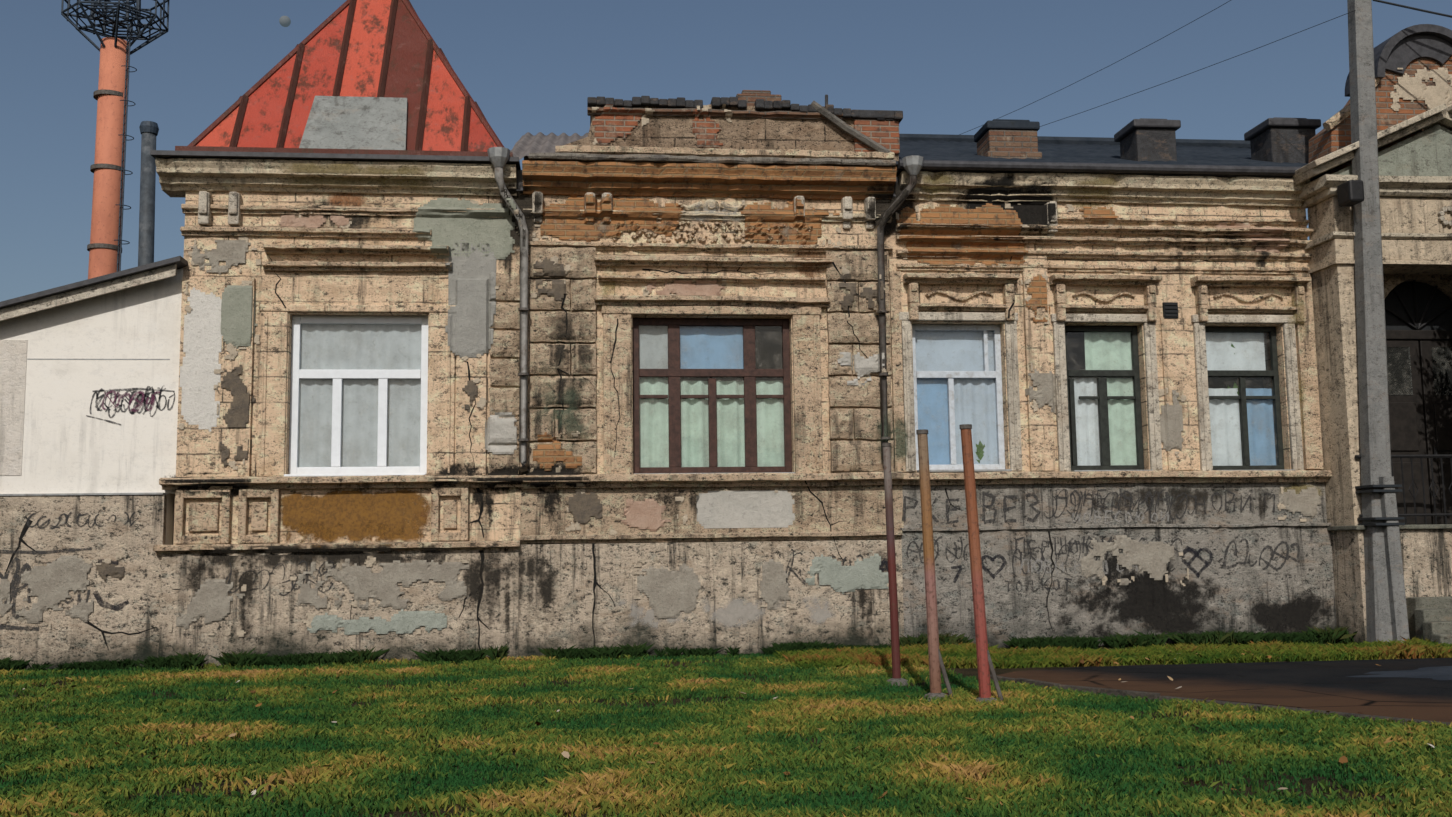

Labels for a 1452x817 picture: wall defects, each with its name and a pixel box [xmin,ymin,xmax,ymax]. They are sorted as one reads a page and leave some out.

flaking render [1390,67,1452,112]
flaking render [896,201,1050,324]
flaking render [214,335,260,470]
water stain [187,545,446,635]
water stain [464,551,555,630]
water stain [1104,554,1171,603]